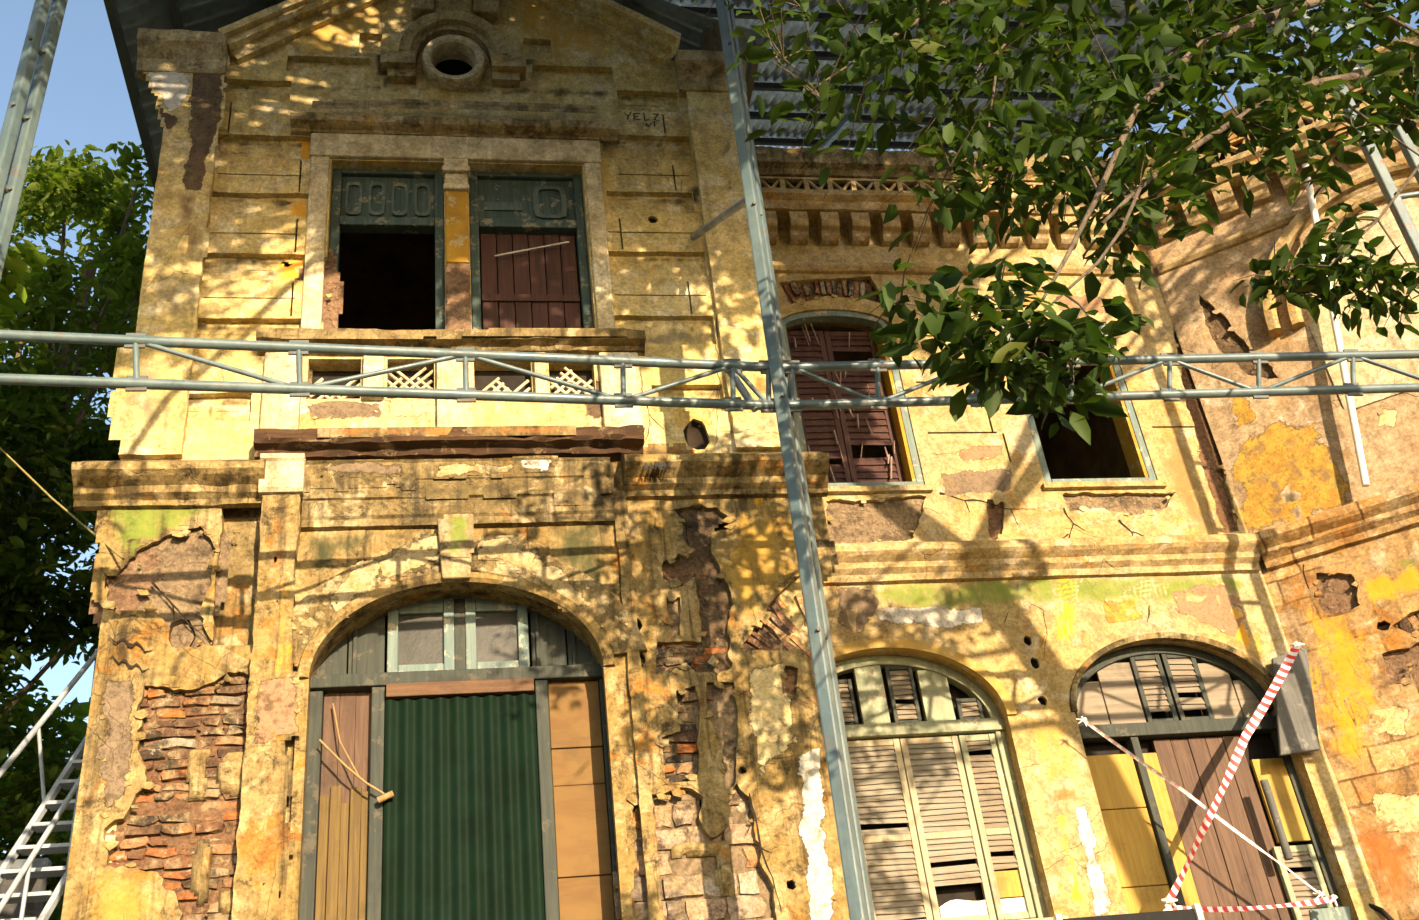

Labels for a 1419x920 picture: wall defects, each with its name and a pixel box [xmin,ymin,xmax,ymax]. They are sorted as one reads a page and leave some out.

spalling [143,55,230,191]
spalling [1200,297,1277,379]
peeling [938,443,1015,540]
peeling [1173,327,1357,533]
spalling [89,529,241,649]
spalling [809,497,989,637]
spalling [1313,573,1359,615]
spalling [612,498,840,920]
peeling [1368,612,1419,742]
spalling [61,672,303,920]